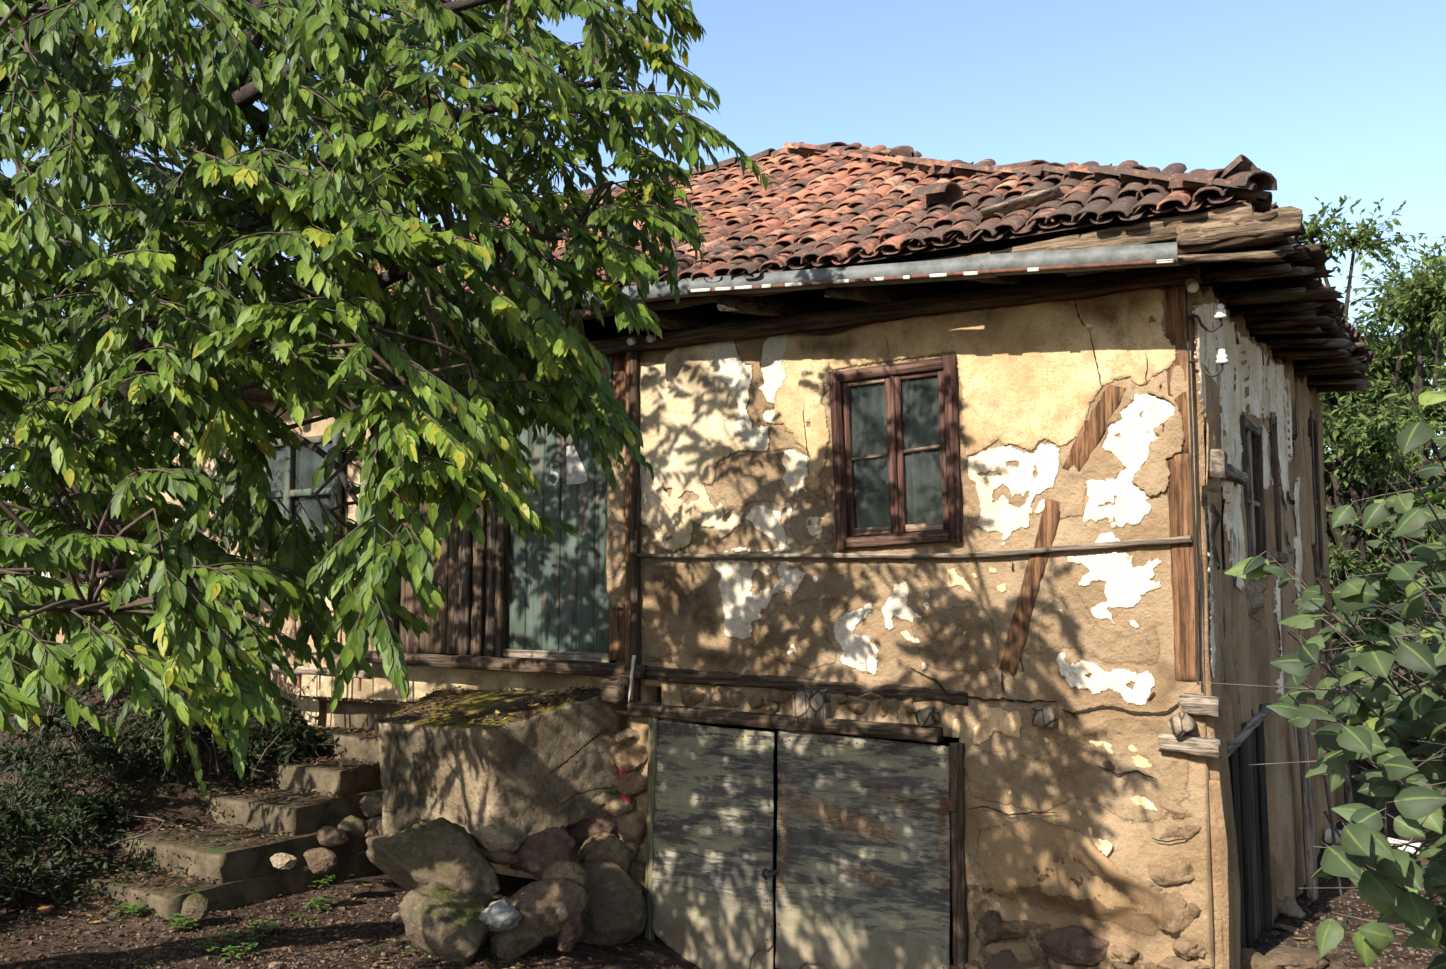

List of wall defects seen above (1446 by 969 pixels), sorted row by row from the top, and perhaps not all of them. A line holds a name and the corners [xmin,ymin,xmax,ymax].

spalling [707,334,1007,675]
spalling [952,377,1190,856]
peeling [1192,300,1303,696]